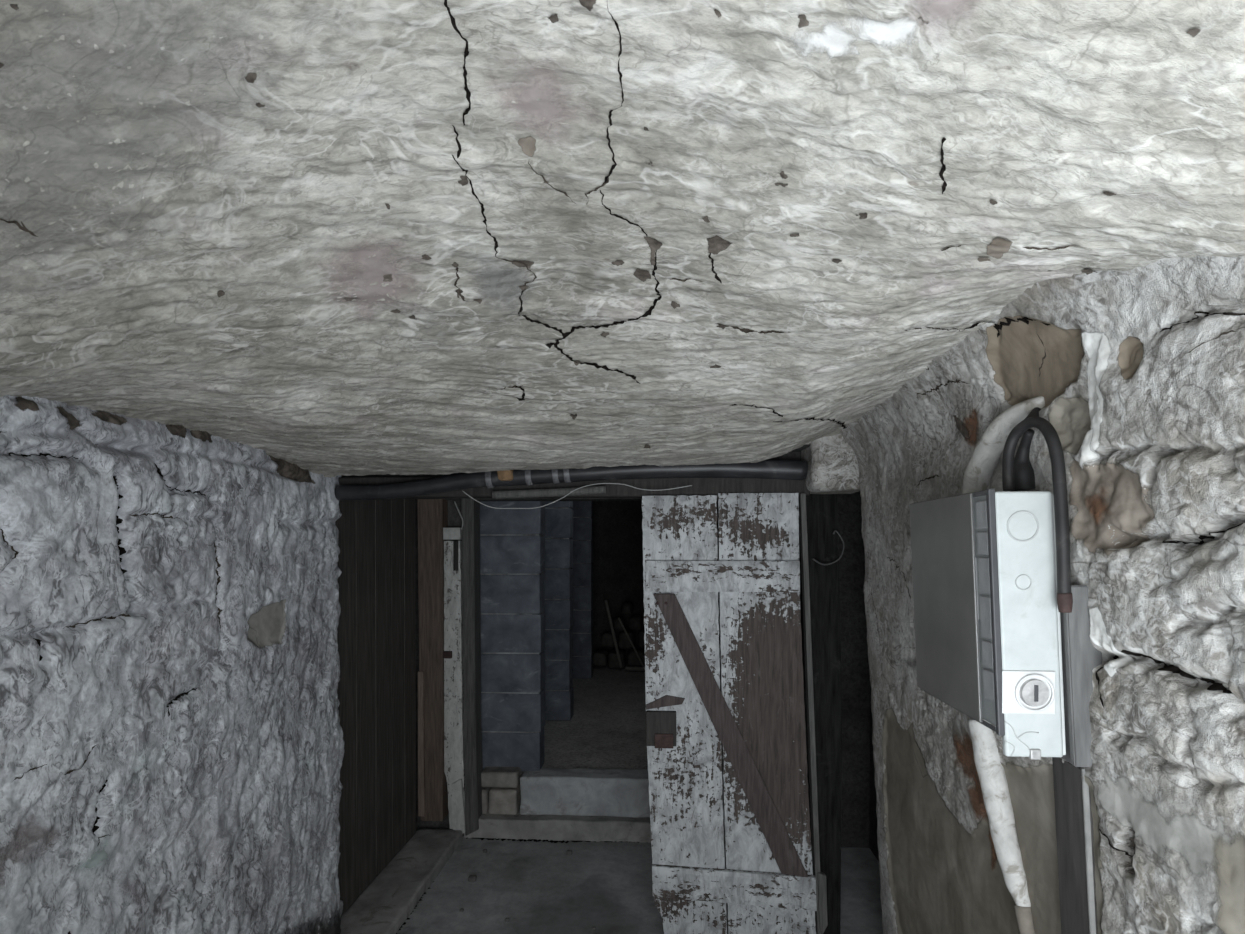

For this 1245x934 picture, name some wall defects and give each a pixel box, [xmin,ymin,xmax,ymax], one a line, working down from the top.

crack [444,0,703,384]
crack [939,137,947,194]
crack [0,219,38,237]
crack [715,323,791,334]
crack [730,404,847,429]
flaking render [986,315,1155,556]
crack [1162,523,1243,545]
flaking render [247,599,286,648]
crack [1095,650,1232,710]
crack [12,744,112,846]